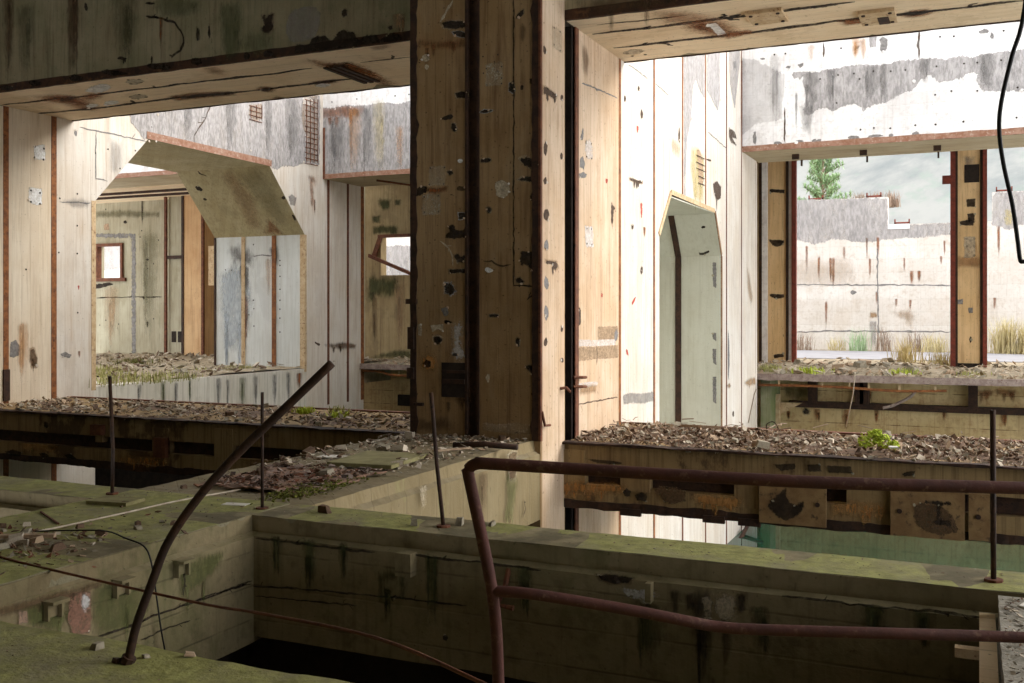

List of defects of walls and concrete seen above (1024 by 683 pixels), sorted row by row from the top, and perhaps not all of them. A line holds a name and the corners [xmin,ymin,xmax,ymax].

rust [313,61,395,86]
peeling [786,29,1024,115]
peeling [130,80,410,174]
spalling [768,488,804,521]
spalling [913,501,958,535]
peeling [67,591,92,634]
crack [99,573,466,640]